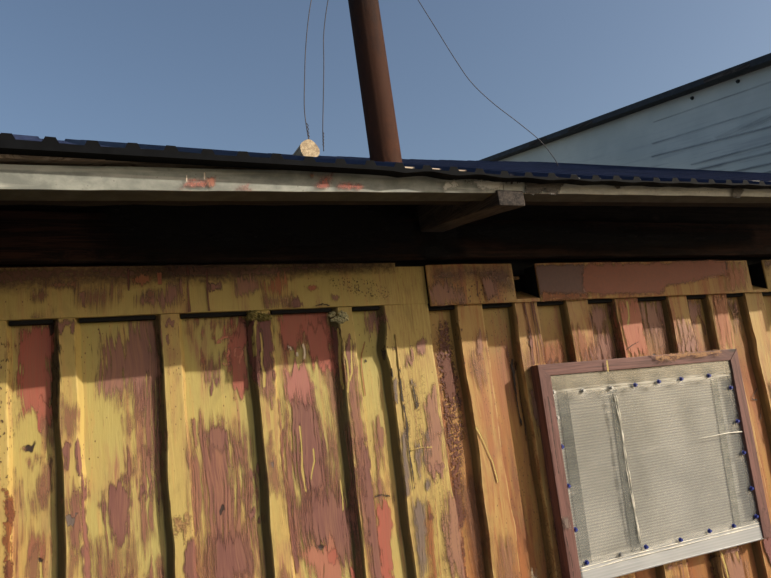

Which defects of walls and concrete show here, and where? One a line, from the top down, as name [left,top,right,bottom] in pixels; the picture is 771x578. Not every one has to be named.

peeling [429,268,512,307]
peeling [536,260,747,372]
peeling [399,379,450,578]
peeling [441,484,465,578]
corrosion [436,321,483,578]